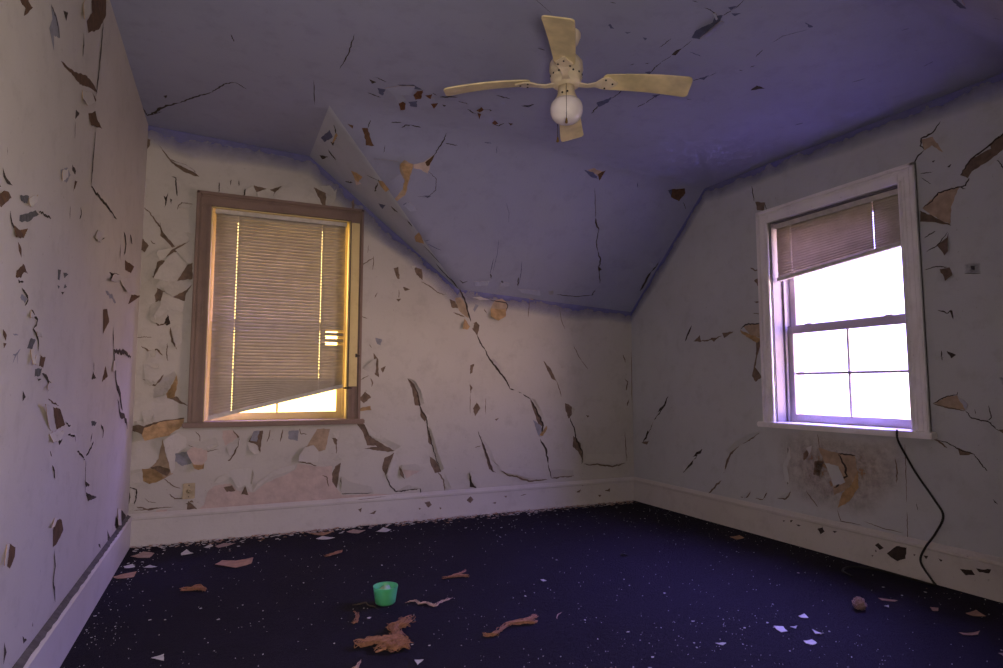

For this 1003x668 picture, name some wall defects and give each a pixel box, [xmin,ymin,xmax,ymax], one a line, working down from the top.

peeling [83,0,106,54]
crack [143,82,246,116]
crack [591,0,744,114]
peeling [218,120,446,244]
crack [914,121,1003,225]
peeling [103,208,194,349]
crack [357,240,668,493]
peeling [130,338,386,514]
crack [934,439,987,471]
crack [966,408,1003,433]
peeling [52,518,63,596]
peeling [872,543,942,561]